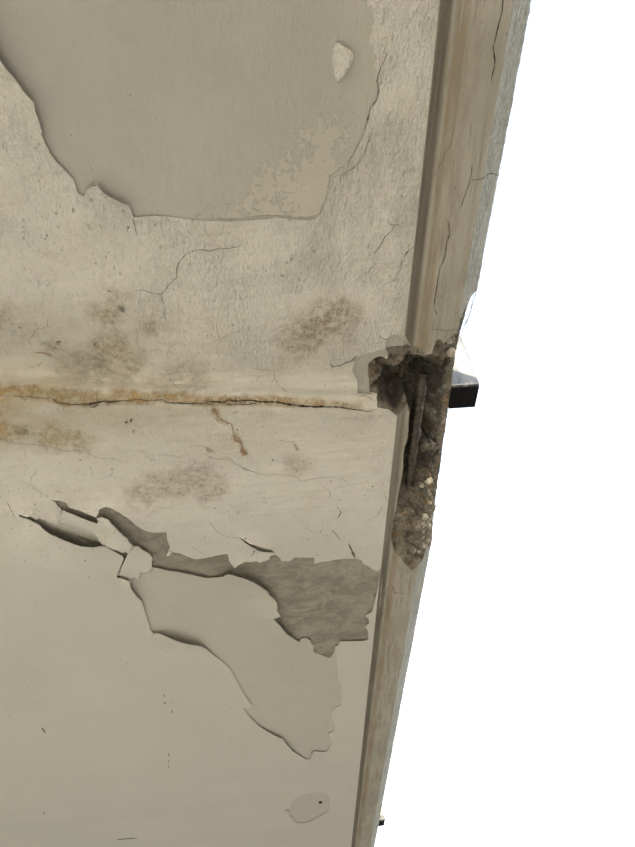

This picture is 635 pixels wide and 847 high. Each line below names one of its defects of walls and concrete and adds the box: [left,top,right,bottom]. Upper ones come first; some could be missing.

crack [491,0,504,81]
peeling [0,0,393,232]
crack [342,46,387,175]
crack [137,244,242,319]
crack [365,222,422,289]
crack [431,125,496,339]
leakage [0,386,248,407]
crack [15,367,372,412]
spalling [342,303,469,570]
peeling [0,485,382,760]
peeling [280,792,332,825]